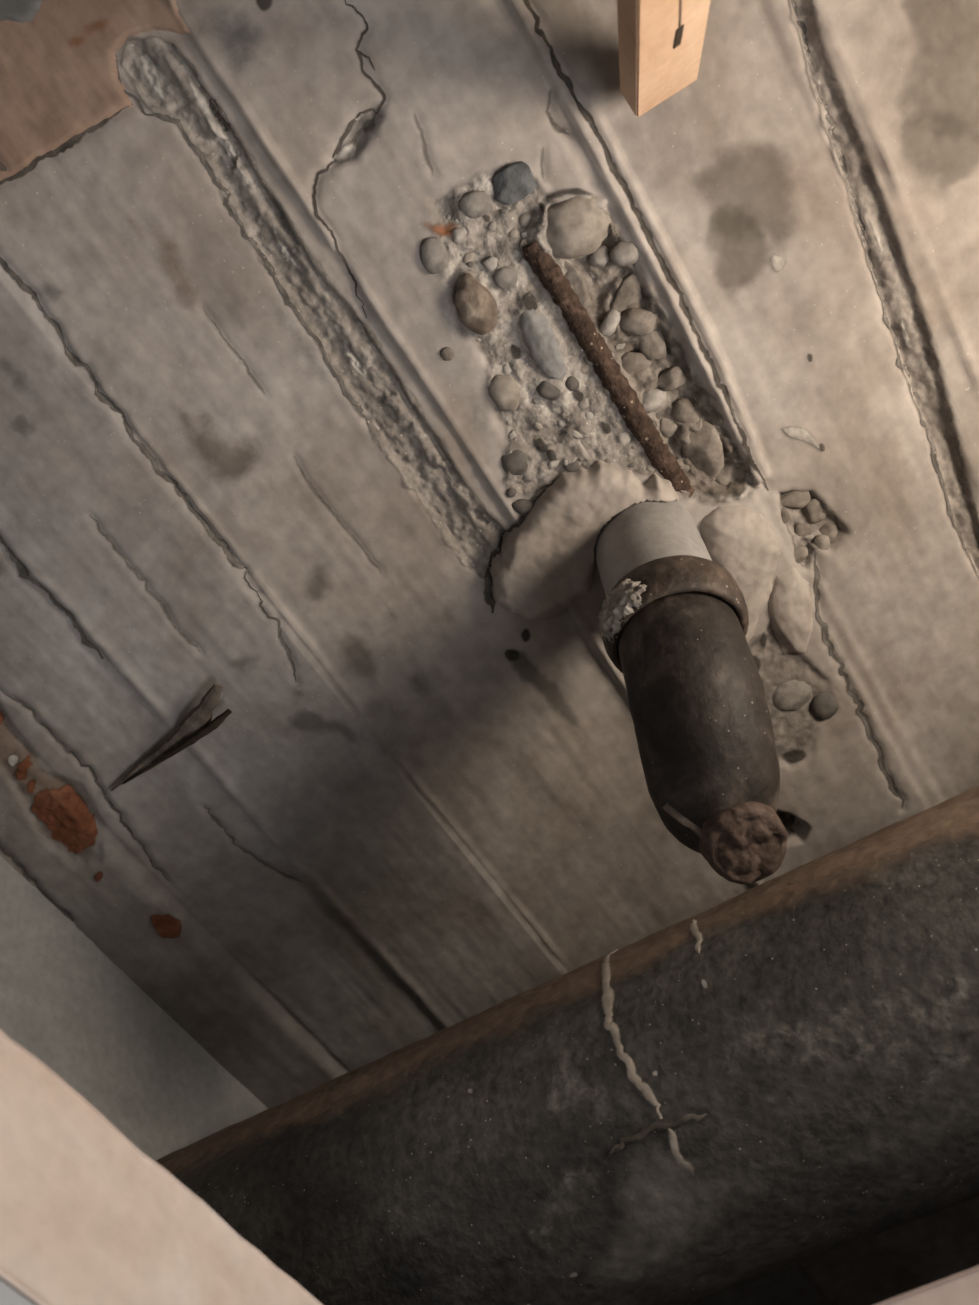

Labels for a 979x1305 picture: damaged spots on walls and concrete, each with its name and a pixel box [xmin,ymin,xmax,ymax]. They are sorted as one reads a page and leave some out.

crack [312,0,386,318]
crack [415,115,434,176]
spalling [421,161,756,516]
crack [813,548,905,809]
crack [609,1113,707,1155]